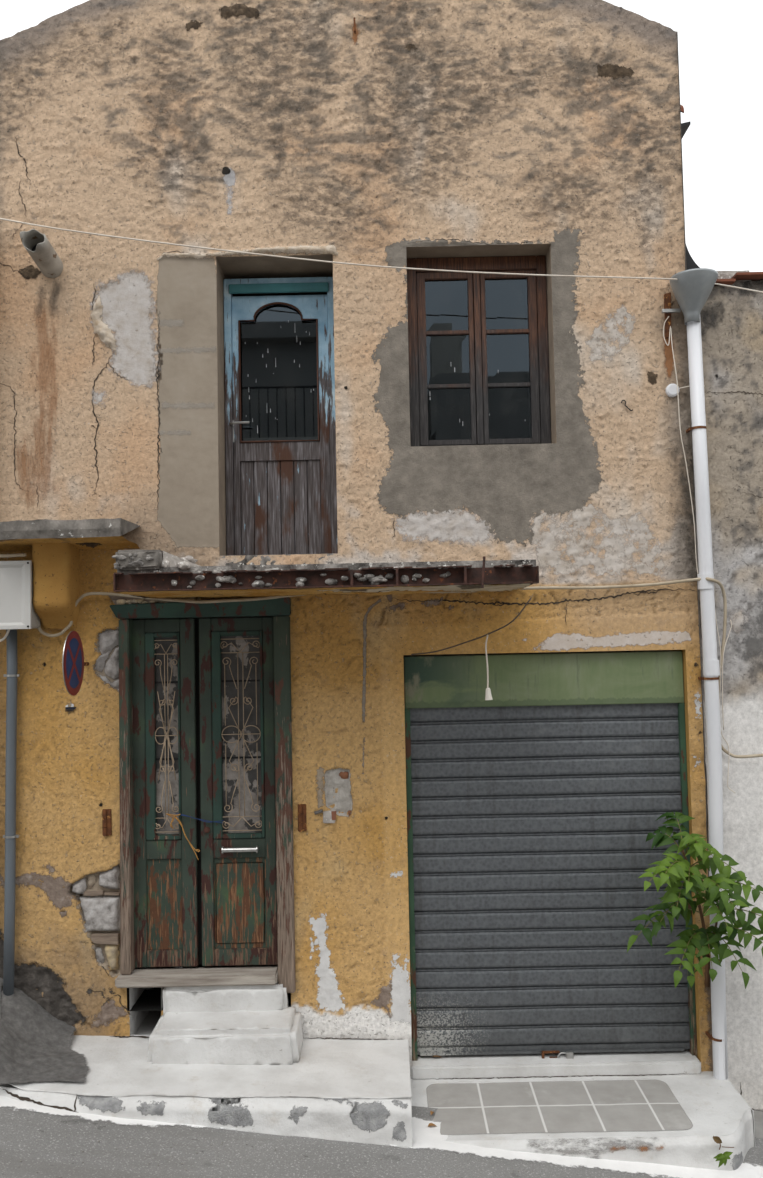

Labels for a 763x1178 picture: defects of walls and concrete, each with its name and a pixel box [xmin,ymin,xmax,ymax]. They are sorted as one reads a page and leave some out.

peeling [90,270,161,388]
crack [92,288,163,508]
peeling [395,509,495,545]
peeling [507,504,665,578]
peeling [317,584,530,612]
crack [268,589,695,622]
spalling [93,627,119,692]
peeling [523,631,691,652]
spalling [0,864,128,1027]
peeling [371,980,392,1018]